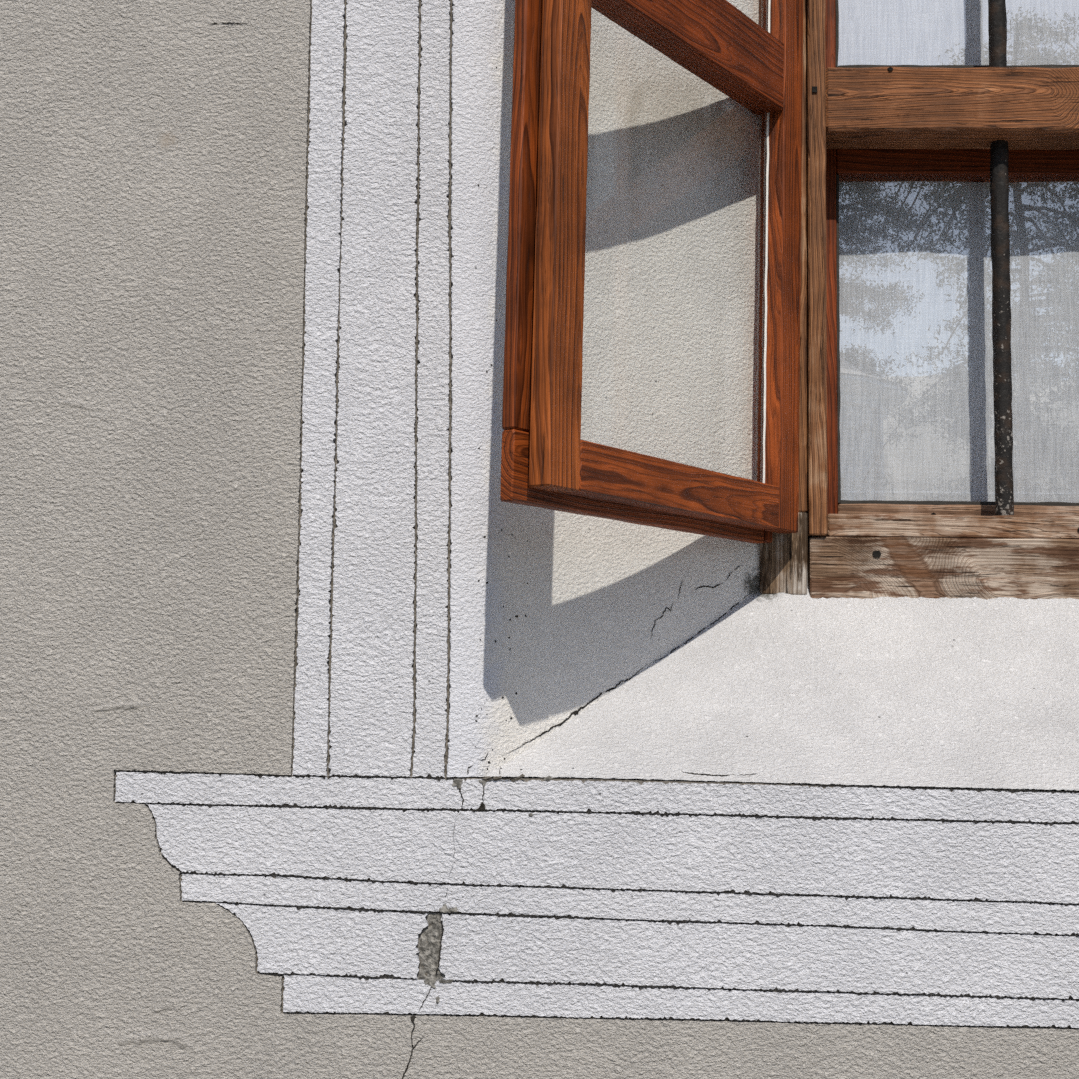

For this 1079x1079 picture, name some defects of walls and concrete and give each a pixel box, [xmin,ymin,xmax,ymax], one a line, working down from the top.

crack [443,566,751,906]
spalling [418,904,458,986]
crack [402,984,440,1079]